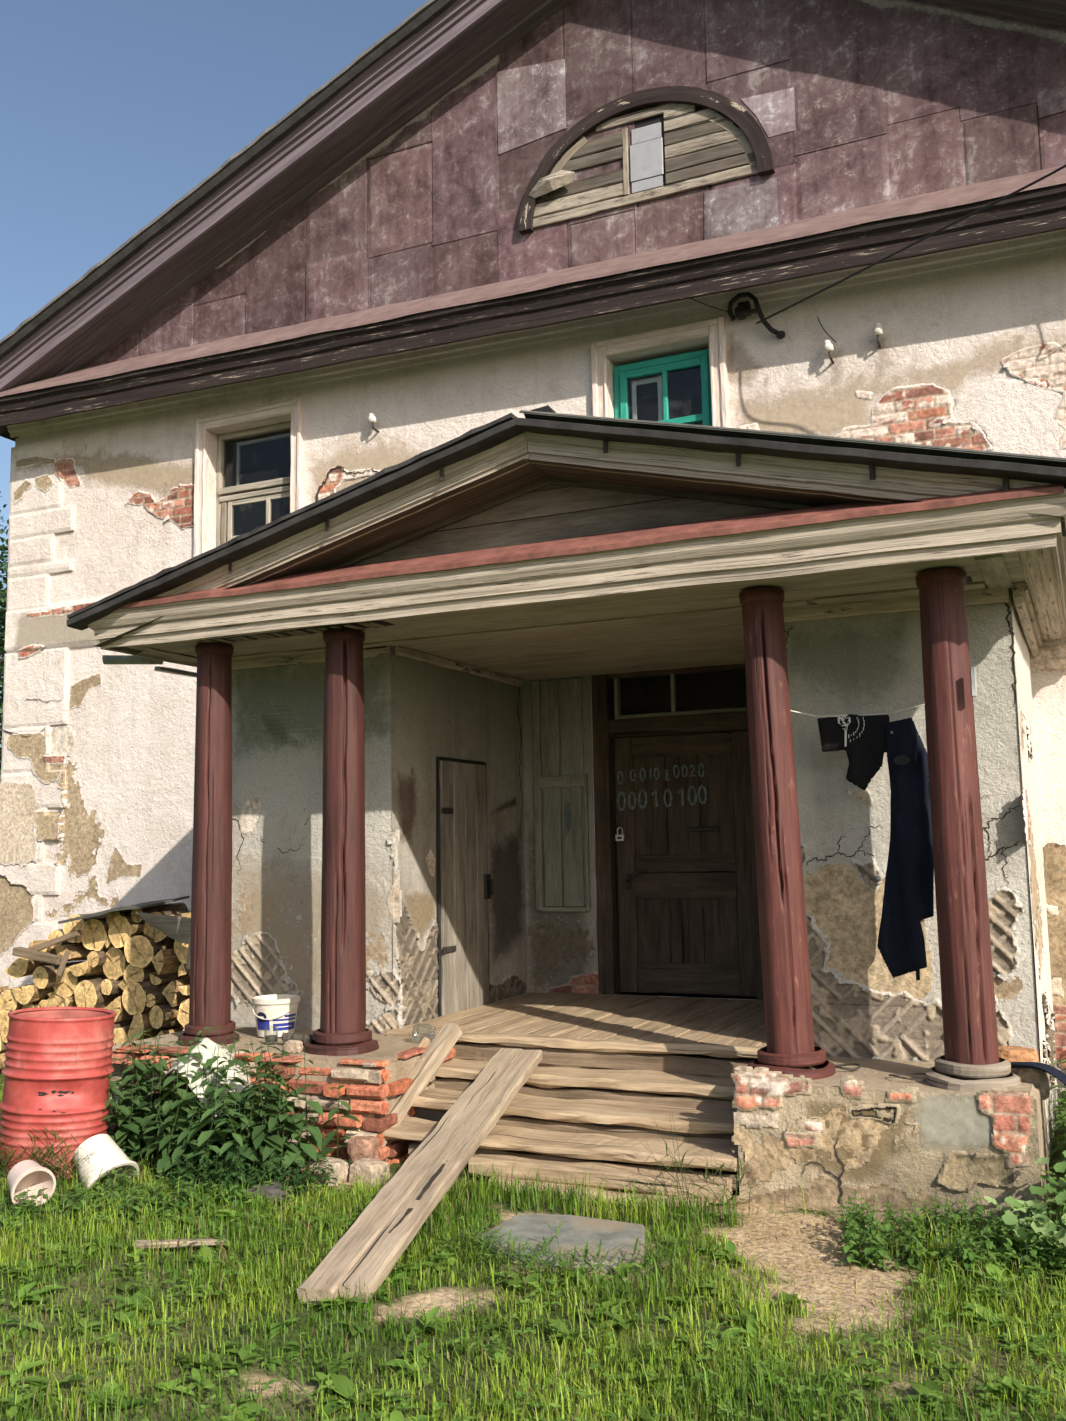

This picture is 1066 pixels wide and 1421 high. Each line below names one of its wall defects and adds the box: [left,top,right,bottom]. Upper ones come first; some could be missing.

flaking render [835,382,992,451]
flaking render [1000,341,1066,450]
flaking render [125,483,194,531]
flaking render [318,467,381,500]
flaking render [1030,638,1066,676]
peeling [0,673,144,956]
crack [806,826,878,865]
crack [980,795,1020,884]
peeling [731,786,1066,1215]
crack [802,1139,845,1204]